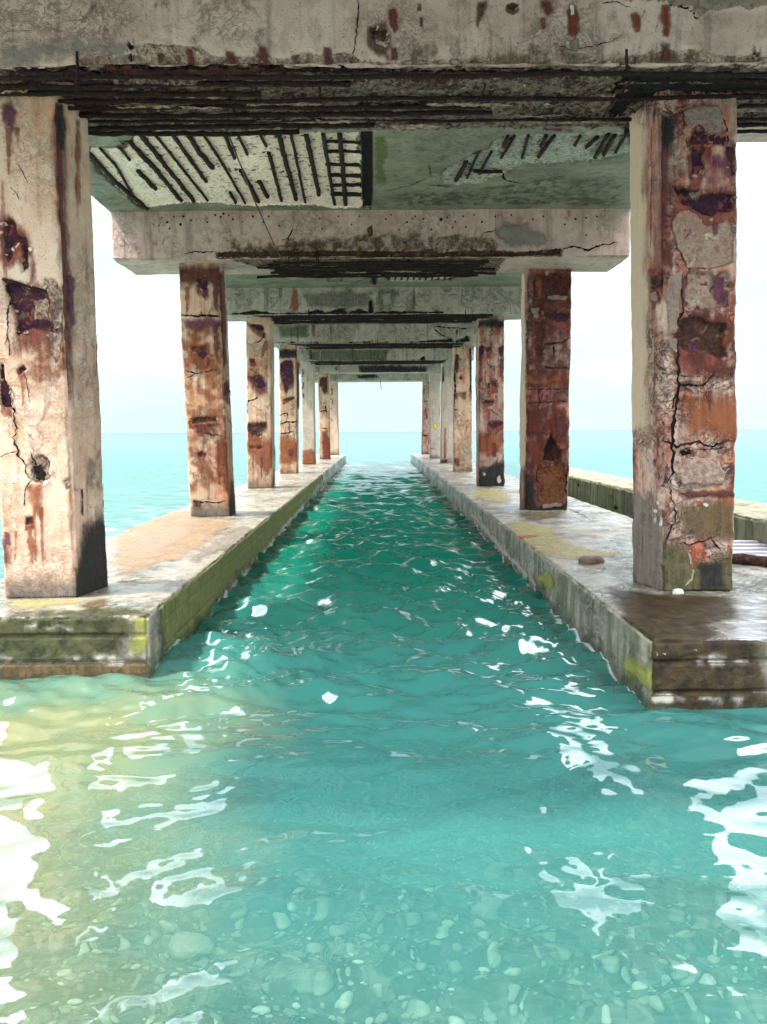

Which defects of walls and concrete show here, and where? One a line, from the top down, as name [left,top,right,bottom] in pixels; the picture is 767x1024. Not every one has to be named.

rust [21,104,81,405]
spalling [0,22,767,430]
crack [540,242,618,251]
crack [1,300,37,505]
rust [2,484,44,565]
water stain [10,489,190,628]
rust [179,265,229,492]
spalling [519,271,571,509]
crack [637,271,737,583]
water stain [611,495,767,662]
rust [681,281,738,441]
water stain [652,694,673,703]